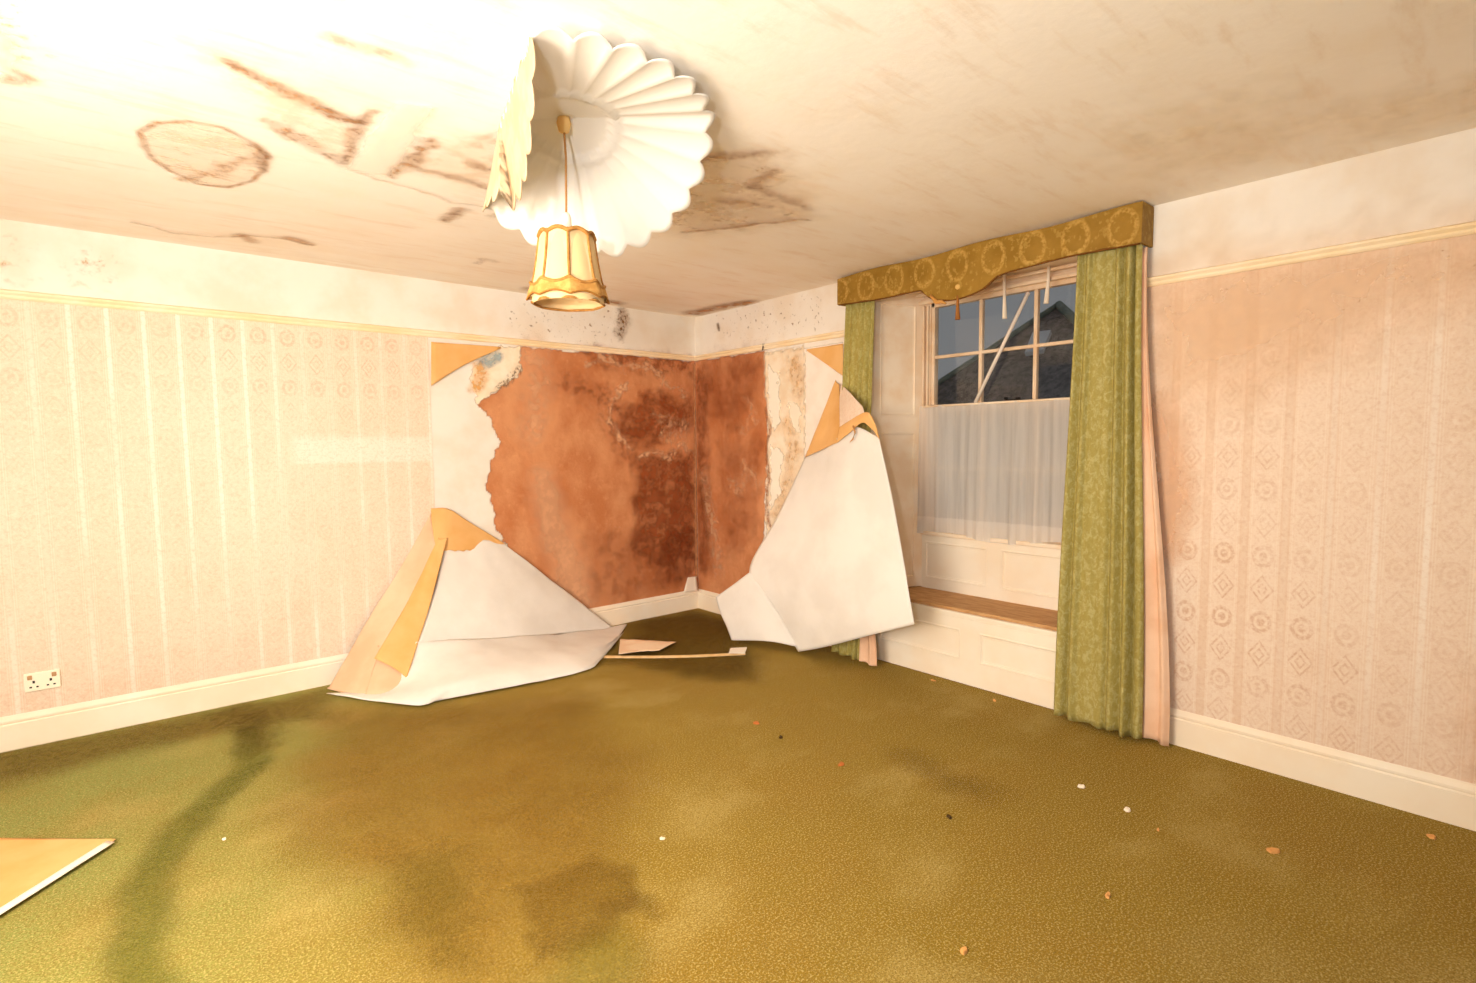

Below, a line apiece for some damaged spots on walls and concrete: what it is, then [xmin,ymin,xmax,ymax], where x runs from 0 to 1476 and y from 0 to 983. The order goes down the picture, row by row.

leakage [225,62,367,162]
leakage [387,140,436,176]
leakage [585,301,721,578]
flaking render [470,343,843,609]